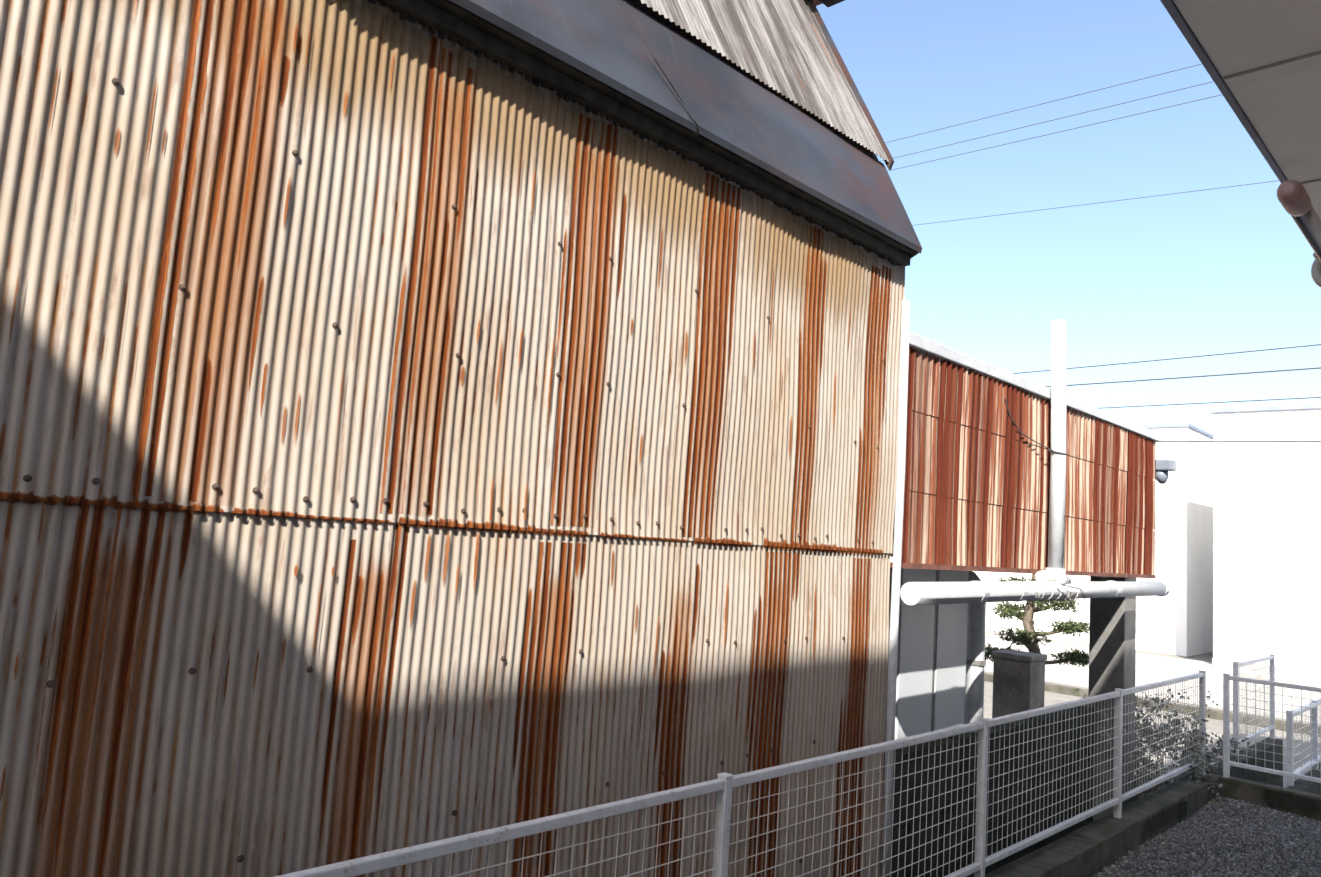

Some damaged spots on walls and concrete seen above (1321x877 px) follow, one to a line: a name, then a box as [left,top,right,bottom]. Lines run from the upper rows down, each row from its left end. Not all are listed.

corrosion [0,0,891,877]
corrosion [901,347,915,563]
corrosion [934,360,1023,568]
corrosion [1037,398,1067,569]
corrosion [1093,419,1156,575]